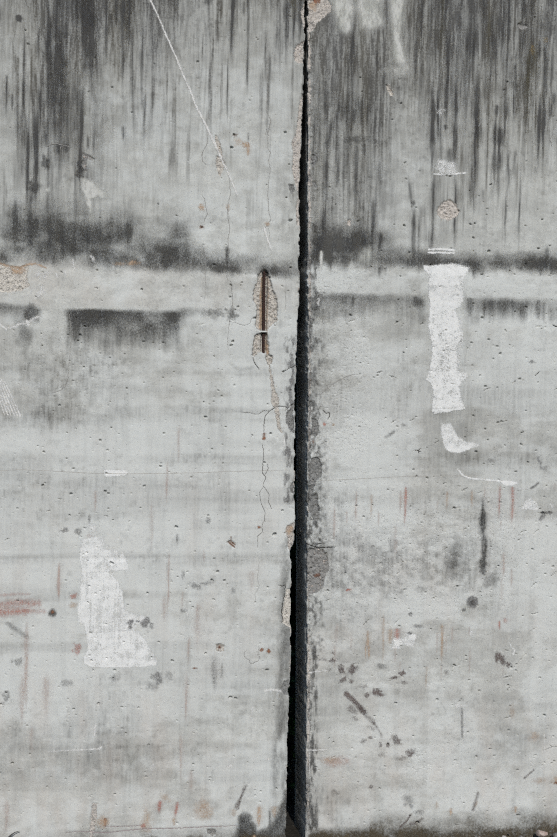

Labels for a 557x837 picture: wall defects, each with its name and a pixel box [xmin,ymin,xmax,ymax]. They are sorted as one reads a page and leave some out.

spalling [293,0,332,69]
water stain [333,0,424,74]
water stain [430,24,458,158]
water stain [26,94,56,200]
spalling [289,79,318,230]
water stain [311,208,385,270]
water stain [400,253,457,267]
water stain [68,309,179,341]
spalling [252,270,294,433]
spalling [297,240,330,620]
crack [255,445,275,599]
spalling [284,522,295,550]